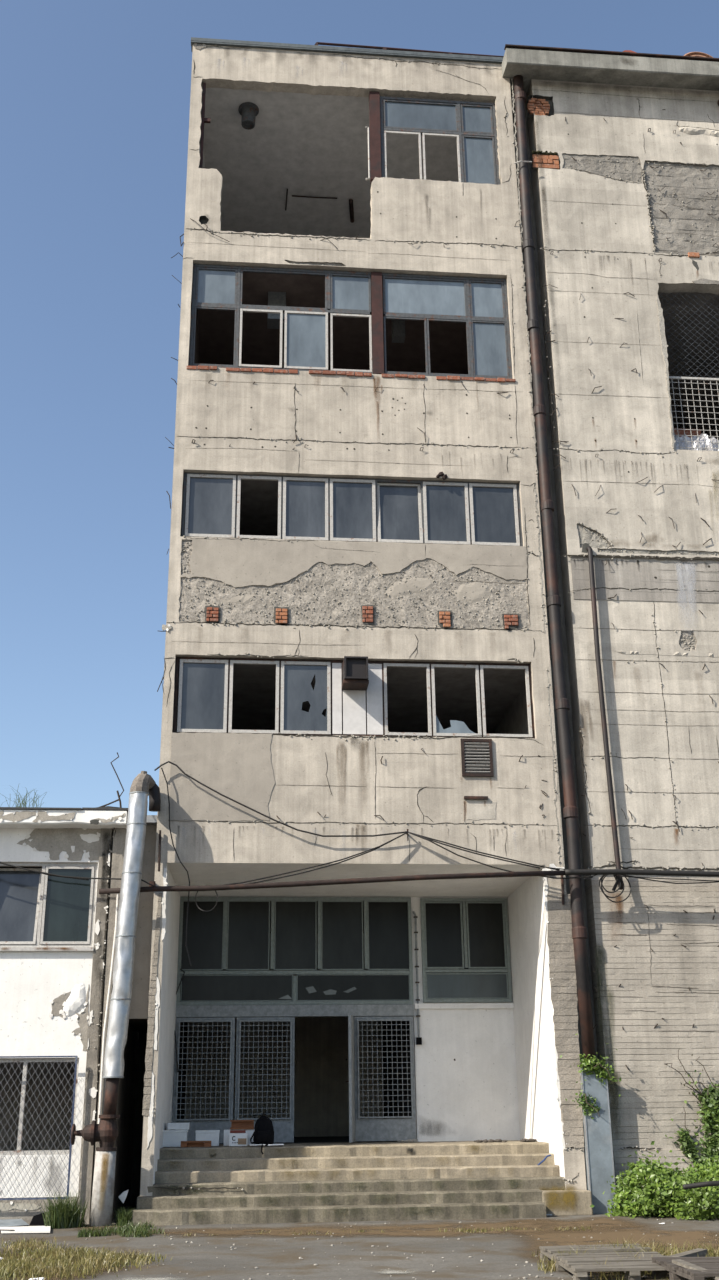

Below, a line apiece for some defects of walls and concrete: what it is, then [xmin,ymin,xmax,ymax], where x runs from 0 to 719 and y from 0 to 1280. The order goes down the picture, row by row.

spalling [562,153,719,285]
spalling [162,540,530,631]
peeling [0,810,125,867]
peeling [49,986,93,1051]